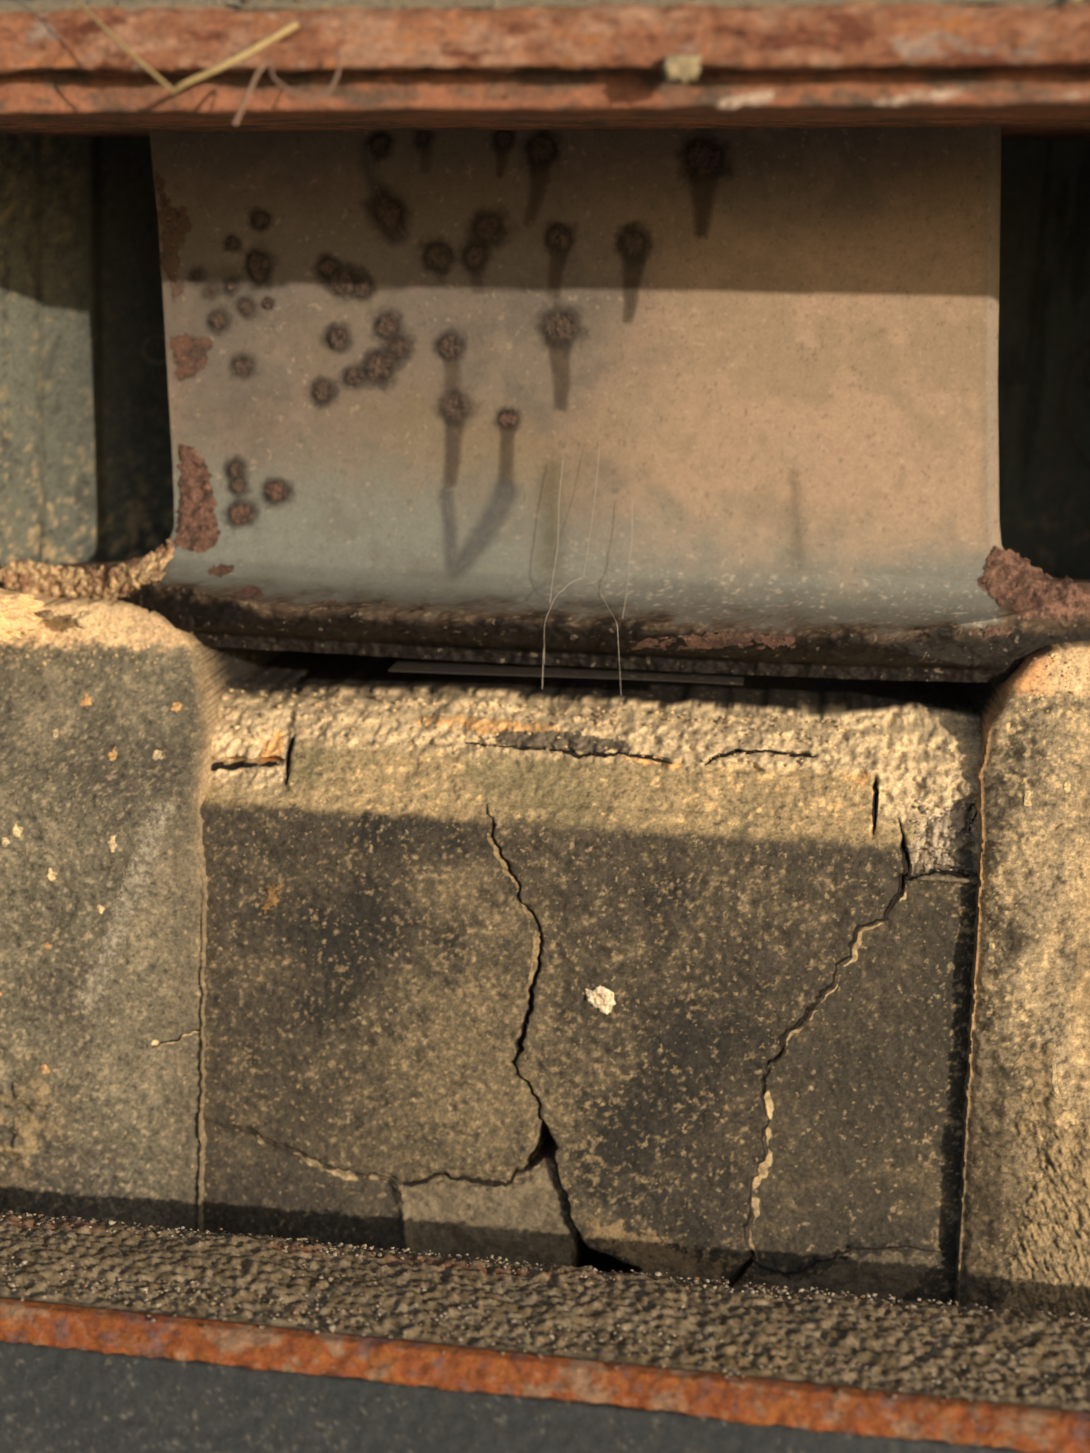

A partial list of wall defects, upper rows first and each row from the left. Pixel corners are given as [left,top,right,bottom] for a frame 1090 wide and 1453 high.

corrosion [0,1,1090,76]
corrosion [171,235,275,381]
corrosion [311,312,413,408]
corrosion [434,331,471,486]
corrosion [173,444,293,578]
corrosion [978,545,1090,638]
crack [211,737,294,784]
crack [465,742,816,765]
spalling [914,799,977,875]
crack [233,804,583,1241]
crack [728,779,970,1287]
corrosion [0,1297,1090,1453]